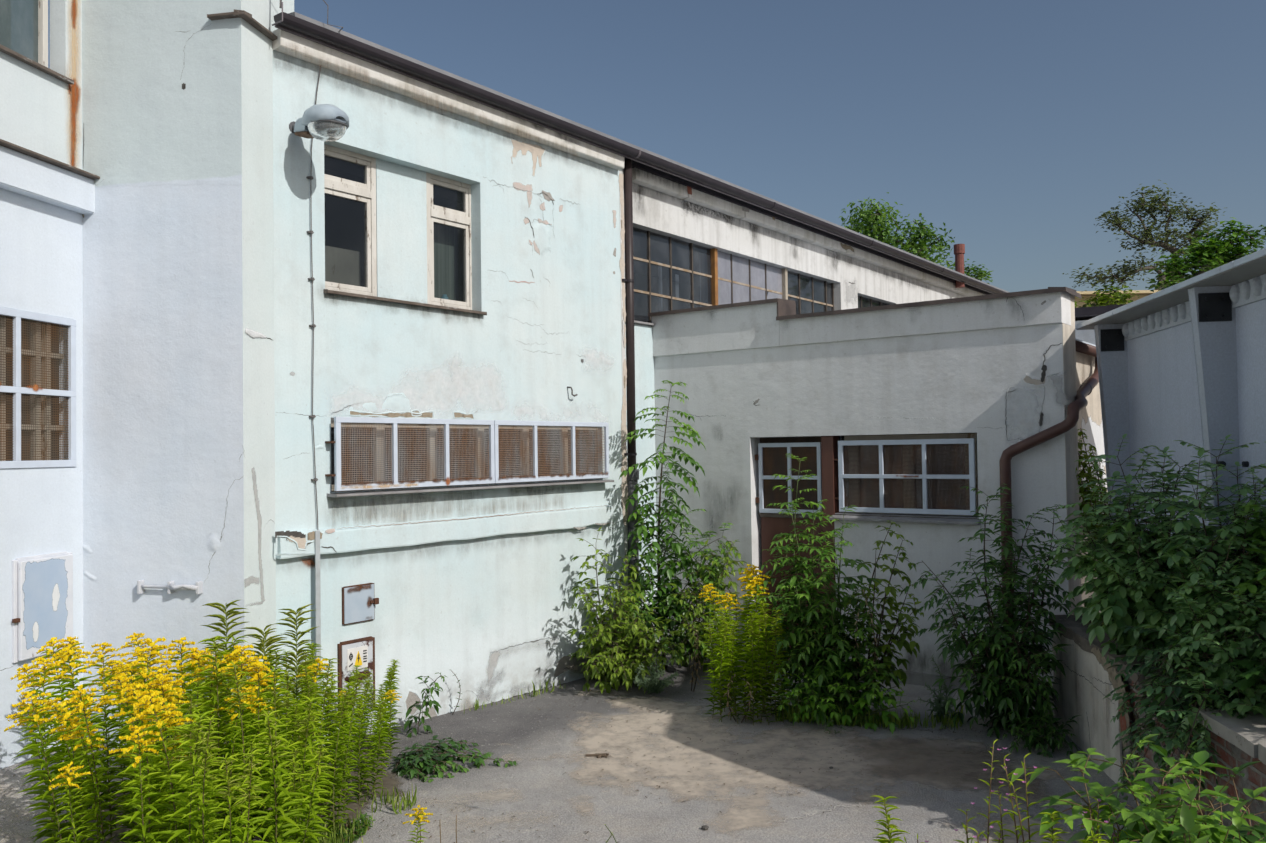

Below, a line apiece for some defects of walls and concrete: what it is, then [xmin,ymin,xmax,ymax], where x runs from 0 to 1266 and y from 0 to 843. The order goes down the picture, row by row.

corrosion [69,0,79,166]
peeling [491,138,576,256]
spalling [349,409,435,419]
spalling [453,411,475,420]
spalling [275,529,337,556]
peeling [488,637,554,680]
spalling [553,652,595,680]